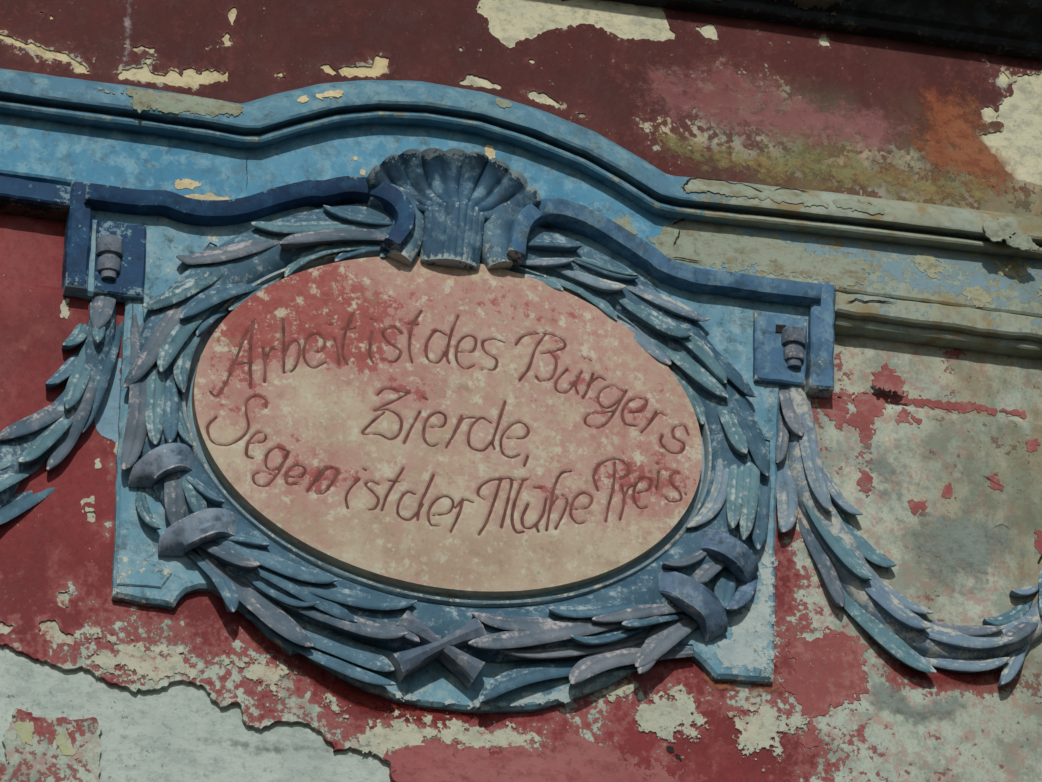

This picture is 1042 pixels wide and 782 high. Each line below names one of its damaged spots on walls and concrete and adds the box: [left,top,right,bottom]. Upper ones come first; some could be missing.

peeling [0,34,90,74]
spalling [98,44,244,117]
peeling [476,0,675,48]
peeling [696,24,718,40]
peeling [979,72,1042,185]
peeling [681,178,885,215]
peeling [817,391,922,450]
peeling [907,499,928,517]
peeling [57,591,70,608]
flaking render [0,620,551,782]
peeling [602,674,711,761]
peeling [727,697,810,771]